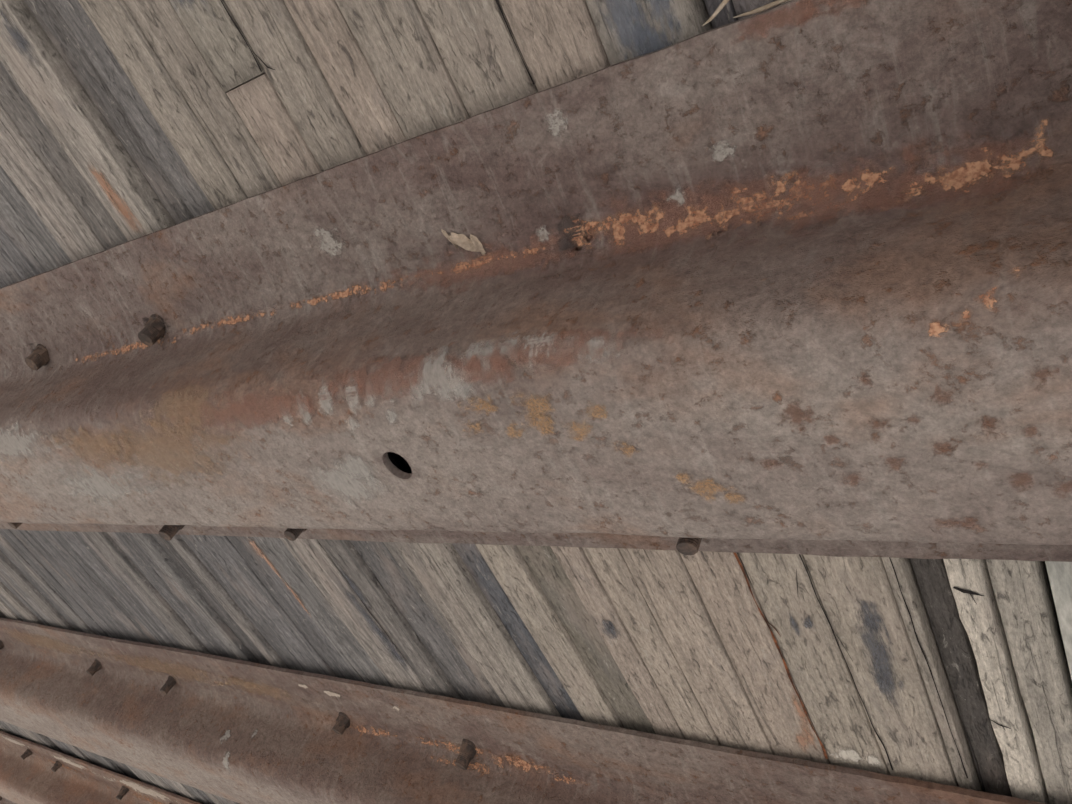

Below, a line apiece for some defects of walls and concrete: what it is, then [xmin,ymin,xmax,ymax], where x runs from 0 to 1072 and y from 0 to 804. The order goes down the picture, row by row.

rust [905,119,1053,197]
rust [564,167,894,248]
rust [291,246,545,308]
rust [75,311,274,364]
rust [928,322,947,337]
rust [419,737,587,786]